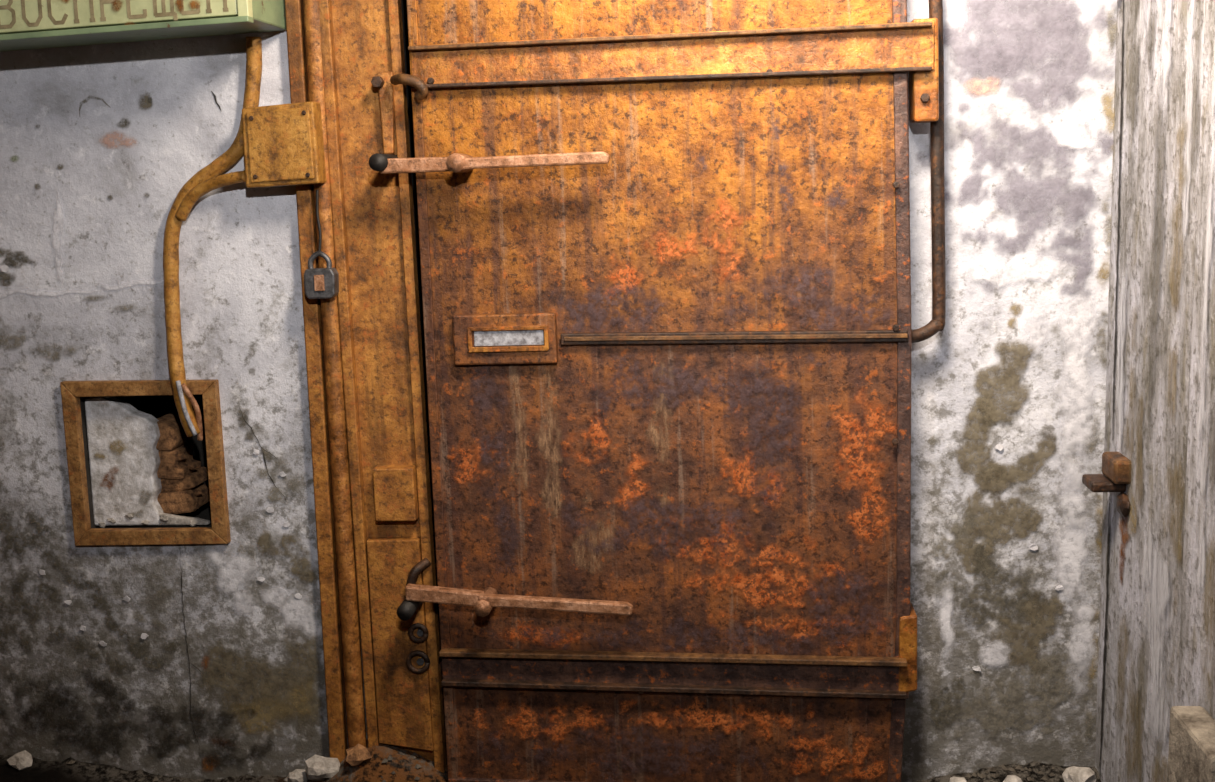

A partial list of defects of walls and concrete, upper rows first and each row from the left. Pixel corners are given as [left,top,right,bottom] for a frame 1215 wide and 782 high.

rust [655,200,741,276]
rust [565,420,610,464]
rust [616,454,647,507]
rust [721,455,784,504]
rust [835,395,895,541]
water stain [931,0,1114,738]
water stain [1117,0,1215,782]
water stain [0,513,52,651]
rust [677,520,853,640]
water stain [0,544,322,766]
rust [496,707,604,741]
rust [638,697,884,779]